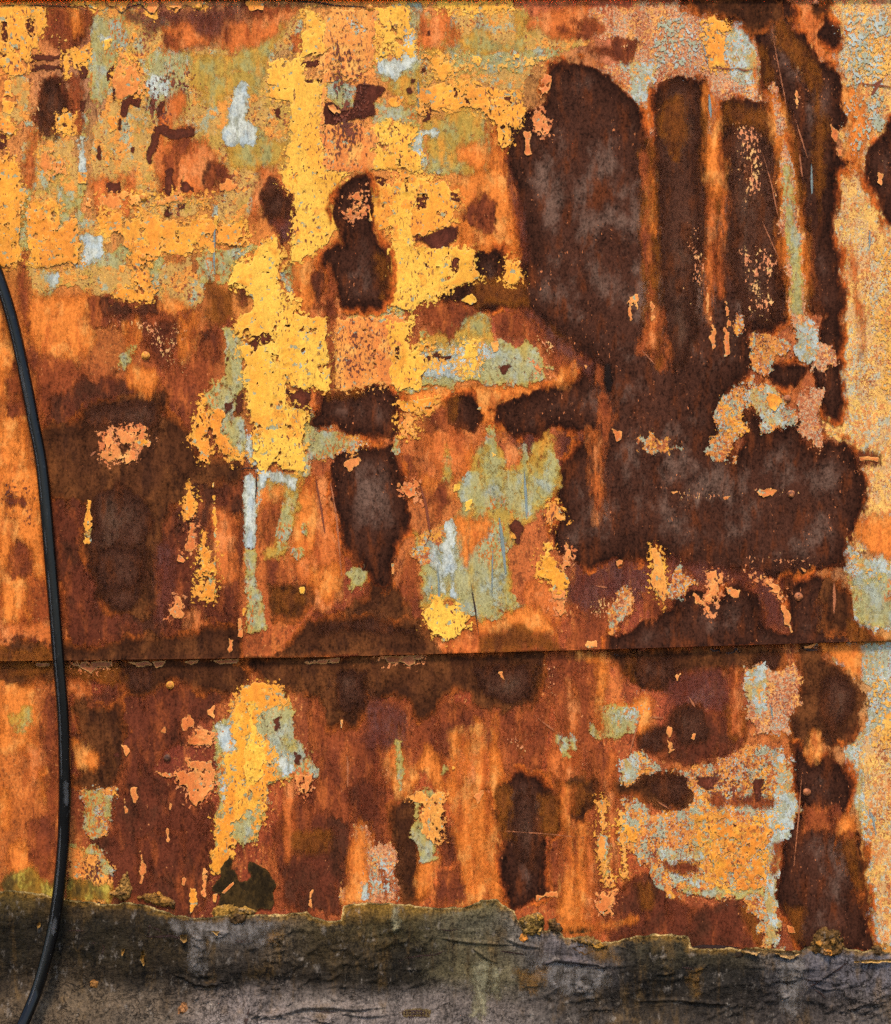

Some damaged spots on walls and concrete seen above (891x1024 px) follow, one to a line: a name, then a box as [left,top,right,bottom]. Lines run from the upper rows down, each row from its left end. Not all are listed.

peeling [0,0,891,652]
corrosion [0,311,58,878]
corrosion [26,279,251,917]
corrosion [235,0,884,951]
water stain [67,878,113,904]
water stain [170,919,272,974]
peeling [156,671,319,924]
water stain [391,908,402,933]
water stain [472,959,499,1016]
water stain [532,958,612,998]
peeling [588,661,804,959]
water stain [777,957,806,1015]